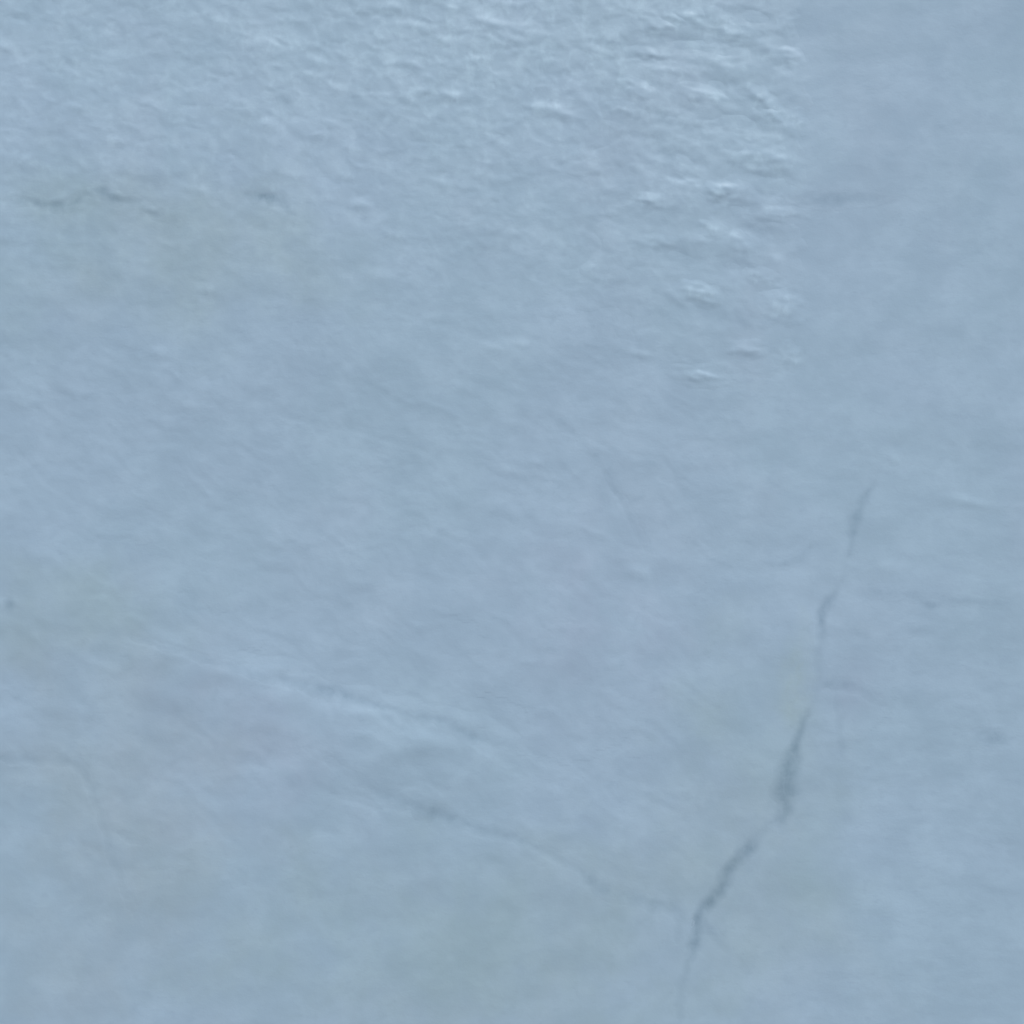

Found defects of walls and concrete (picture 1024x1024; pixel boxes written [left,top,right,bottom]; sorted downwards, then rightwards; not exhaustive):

crack [673,475,893,1024]